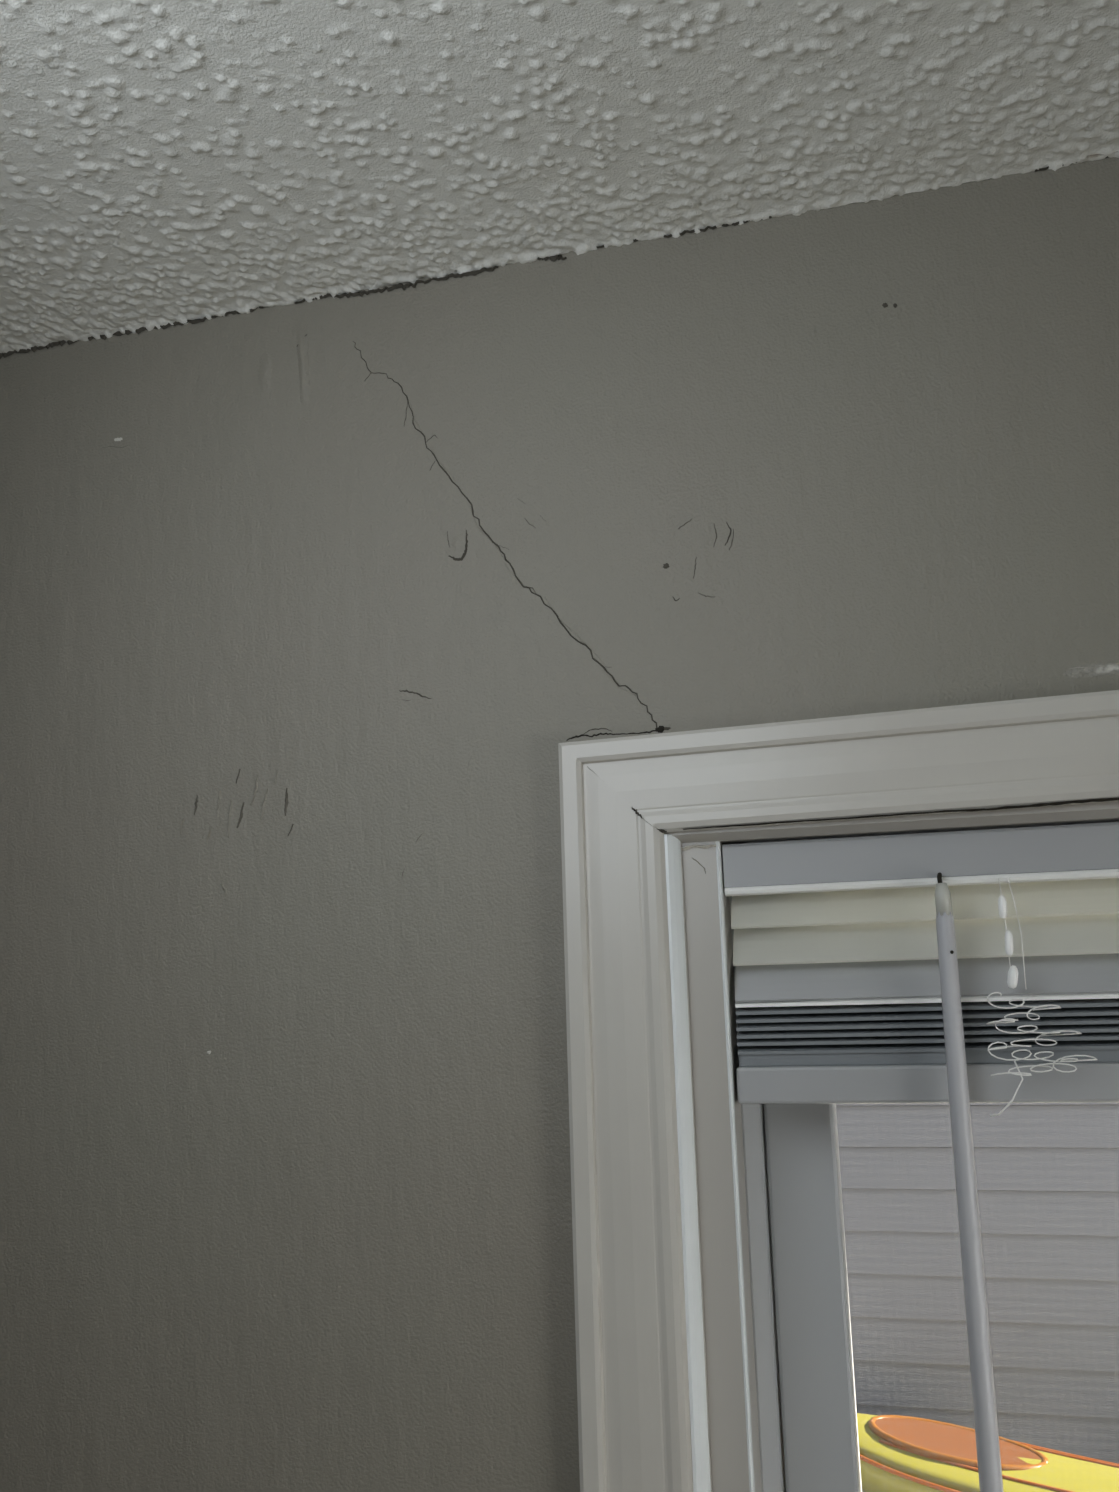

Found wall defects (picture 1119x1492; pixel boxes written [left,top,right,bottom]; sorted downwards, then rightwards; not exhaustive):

crack [353,341,657,776]